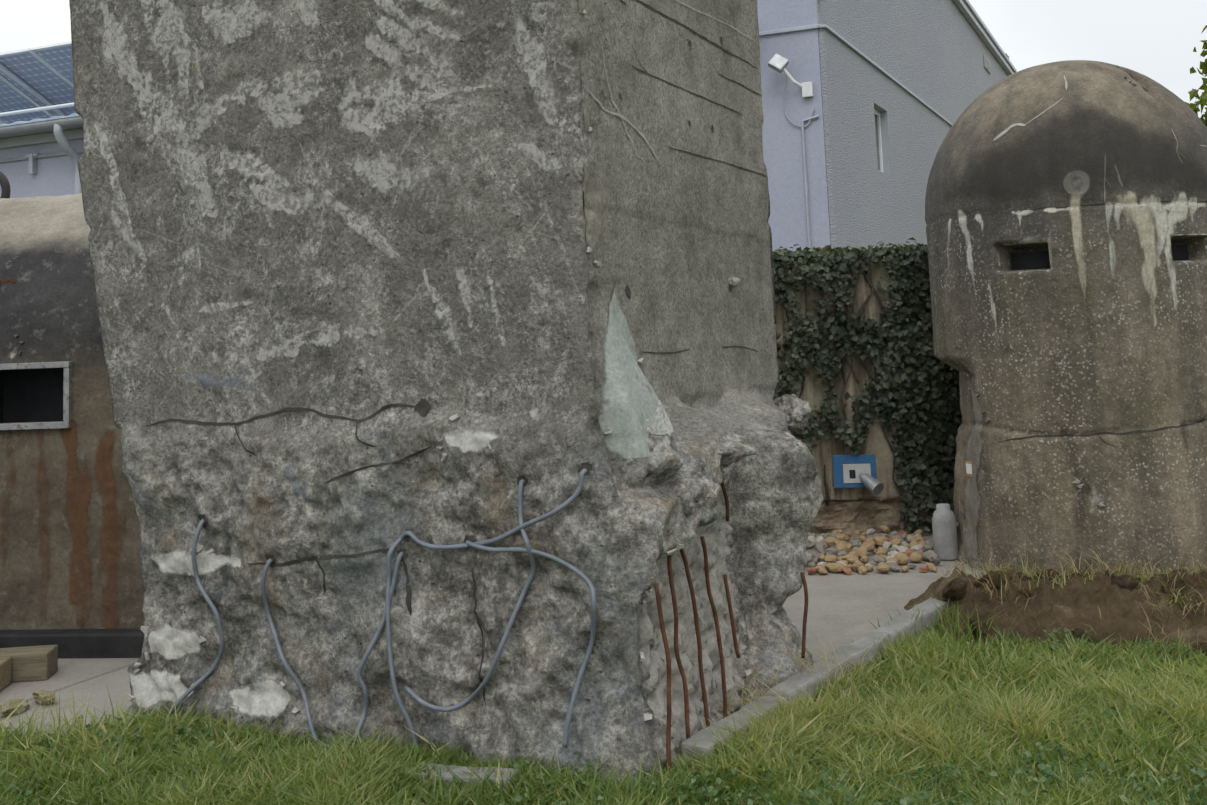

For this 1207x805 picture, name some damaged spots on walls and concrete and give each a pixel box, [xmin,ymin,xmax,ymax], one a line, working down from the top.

damp [948,210,997,333]
damp [975,115,1207,310]
crack [146,404,431,484]
spalling [599,291,674,463]
crack [1000,414,1207,447]
spalling [639,464,757,771]